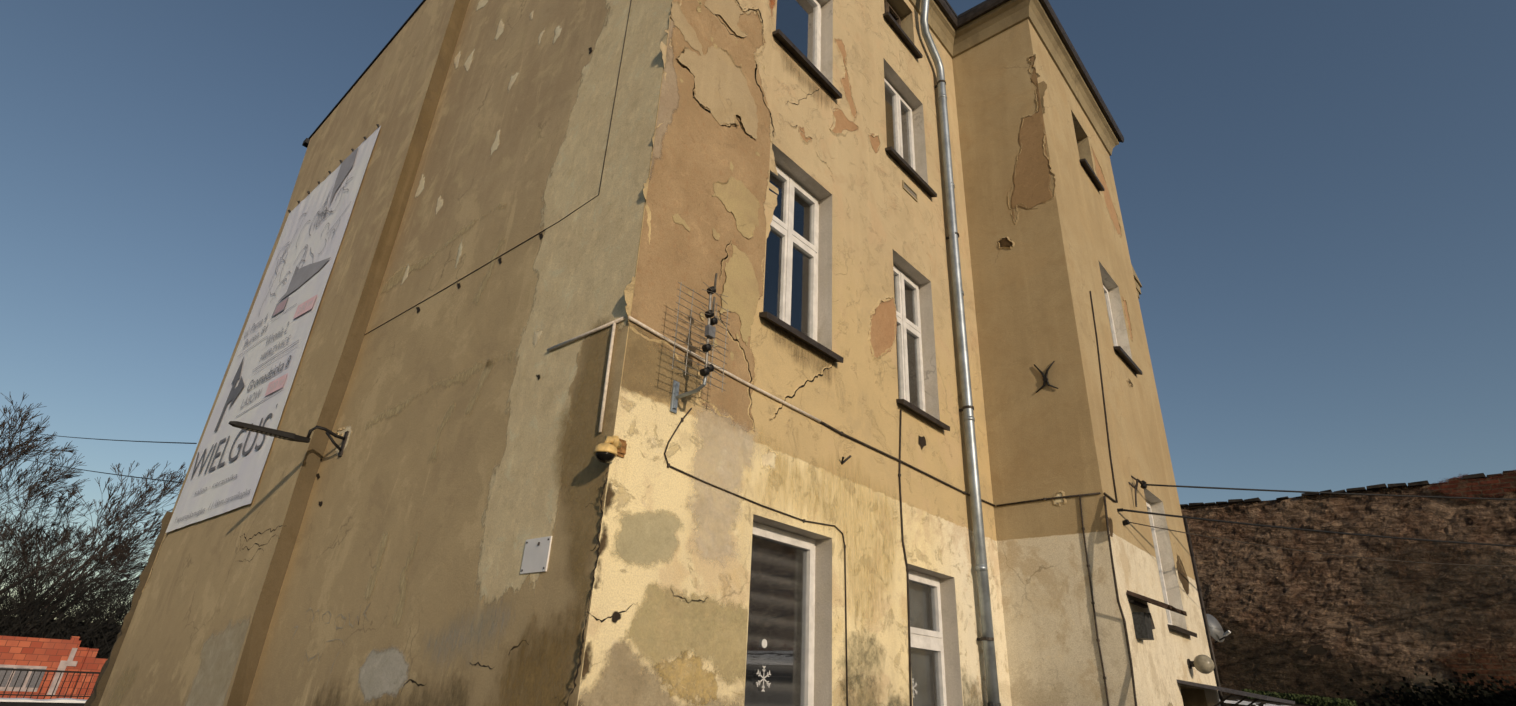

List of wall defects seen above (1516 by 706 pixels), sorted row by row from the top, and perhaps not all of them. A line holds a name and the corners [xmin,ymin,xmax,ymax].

peeling [415,174,443,214]
peeling [454,49,475,72]
spalling [829,37,881,153]
spalling [997,54,1056,250]
peeling [475,0,779,604]
crack [718,243,834,429]
spalling [867,296,897,362]
crack [564,471,633,706]
water stain [501,329,748,706]